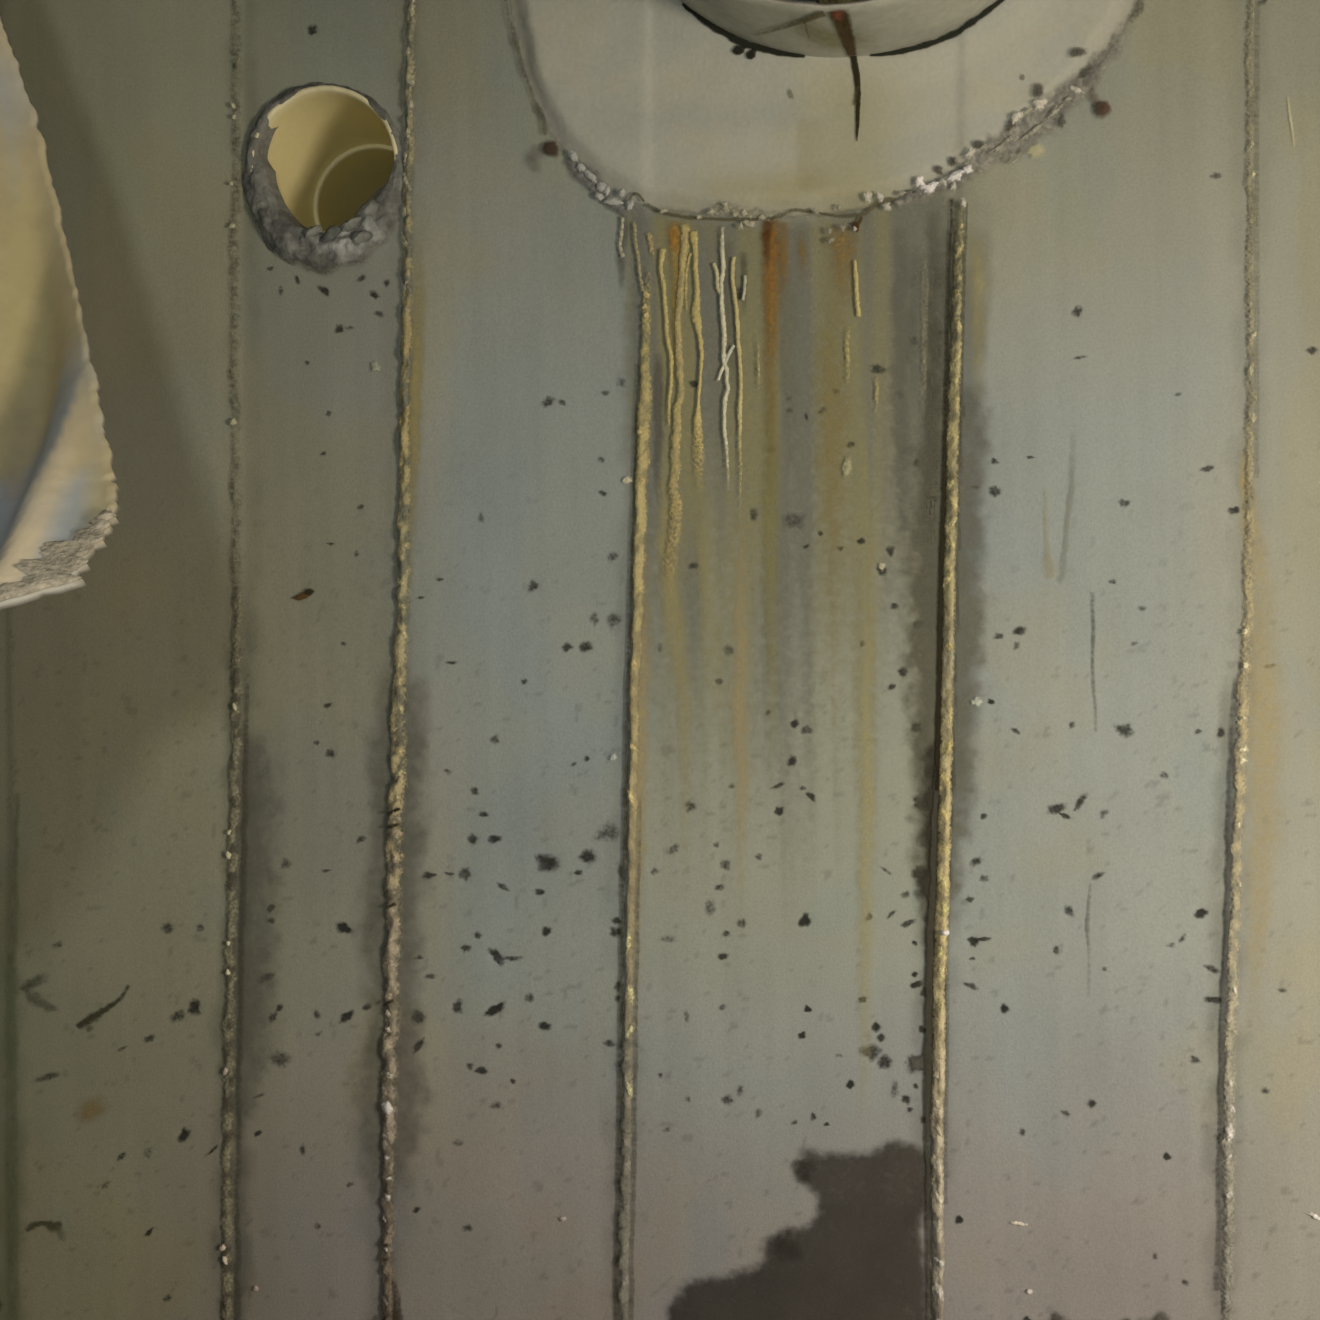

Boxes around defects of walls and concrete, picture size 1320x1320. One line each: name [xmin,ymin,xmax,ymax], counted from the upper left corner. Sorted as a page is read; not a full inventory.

crack [682,3,805,59]
crack [850,0,1004,141]
crack [628,192,895,228]
corrosion [764,220,786,367]
leakage [565,34,1125,1010]
leakage [670,1143,931,1320]